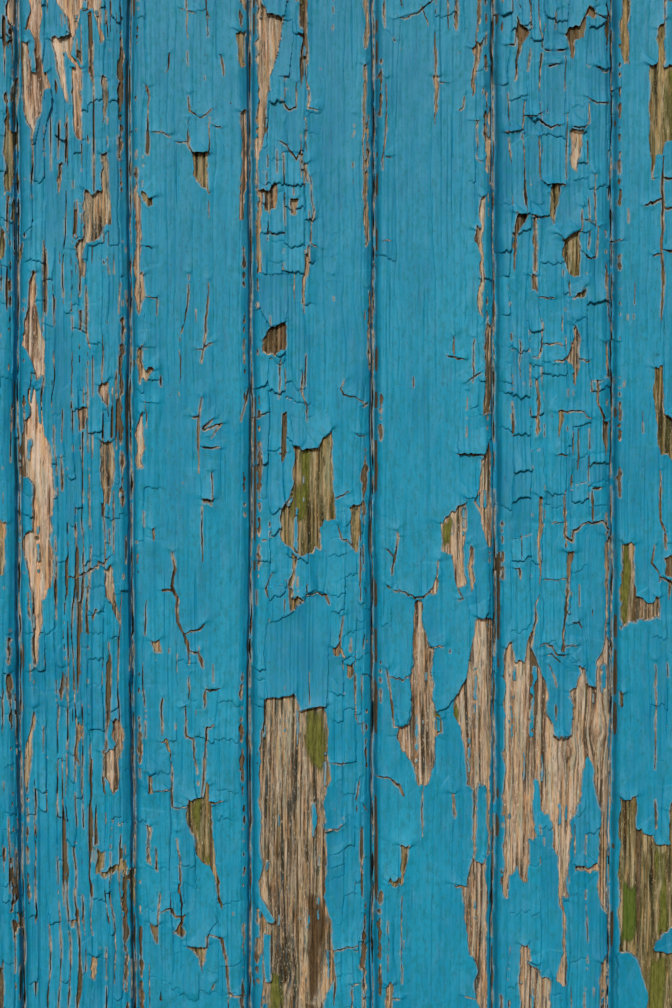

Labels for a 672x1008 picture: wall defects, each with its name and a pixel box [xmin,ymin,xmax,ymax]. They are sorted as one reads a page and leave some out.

crack [285,0,308,110]
crack [522,102,586,212]
crack [645,160,672,321]
crack [180,284,209,378]
peeling [0,0,246,1008]
crack [193,416,222,479]
peeling [174,0,672,1008]
crack [558,410,609,542]
crack [651,487,672,587]
crack [161,564,220,804]
crack [157,867,186,923]
crack [212,937,247,1008]